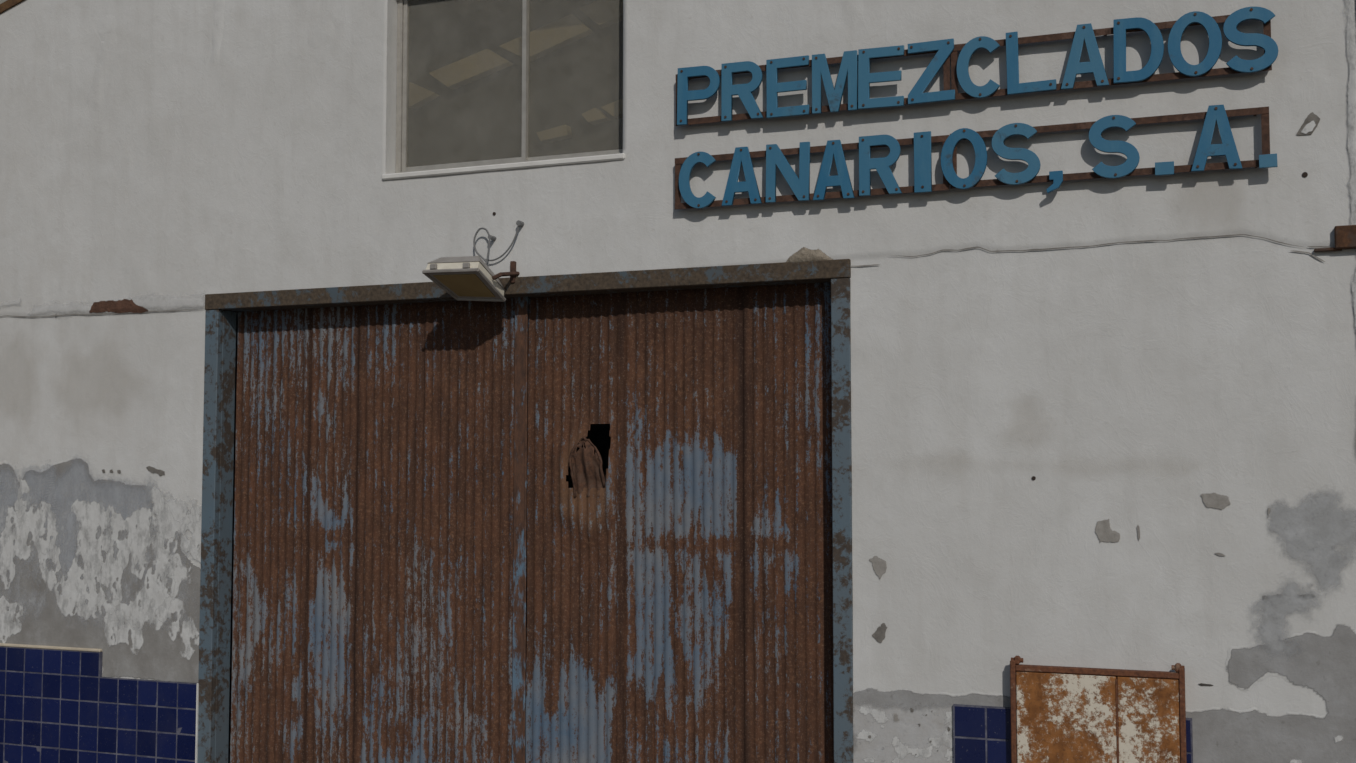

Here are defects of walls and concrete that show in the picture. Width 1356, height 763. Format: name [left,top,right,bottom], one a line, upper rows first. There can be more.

spalling [1297,112,1320,135]
peeling [1095,519,1120,542]
peeling [0,457,202,683]
peeling [869,556,887,579]
peeling [872,623,887,643]
peeling [1186,492,1356,763]
peeling [853,688,1011,763]